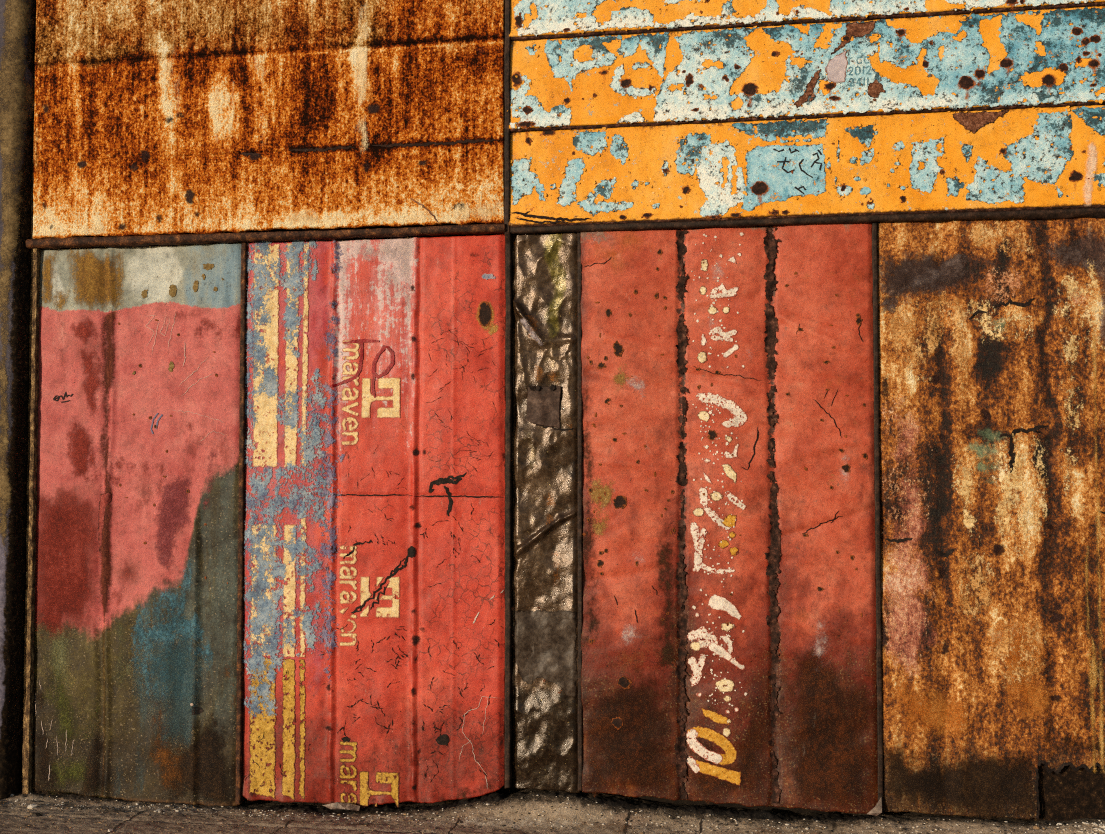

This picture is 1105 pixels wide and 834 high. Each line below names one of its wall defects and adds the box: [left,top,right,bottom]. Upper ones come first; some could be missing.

peeling [507,0,1105,220]
corrosion [42,250,124,309]
corrosion [1051,242,1105,428]
peeling [242,239,372,720]
crack [315,329,500,587]
corrosion [879,220,1035,734]
corrosion [992,433,1047,556]
crack [999,425,1047,473]
spalling [351,556,408,615]
damp [657,543,675,665]
damp [698,724,766,795]
damp [788,650,874,805]